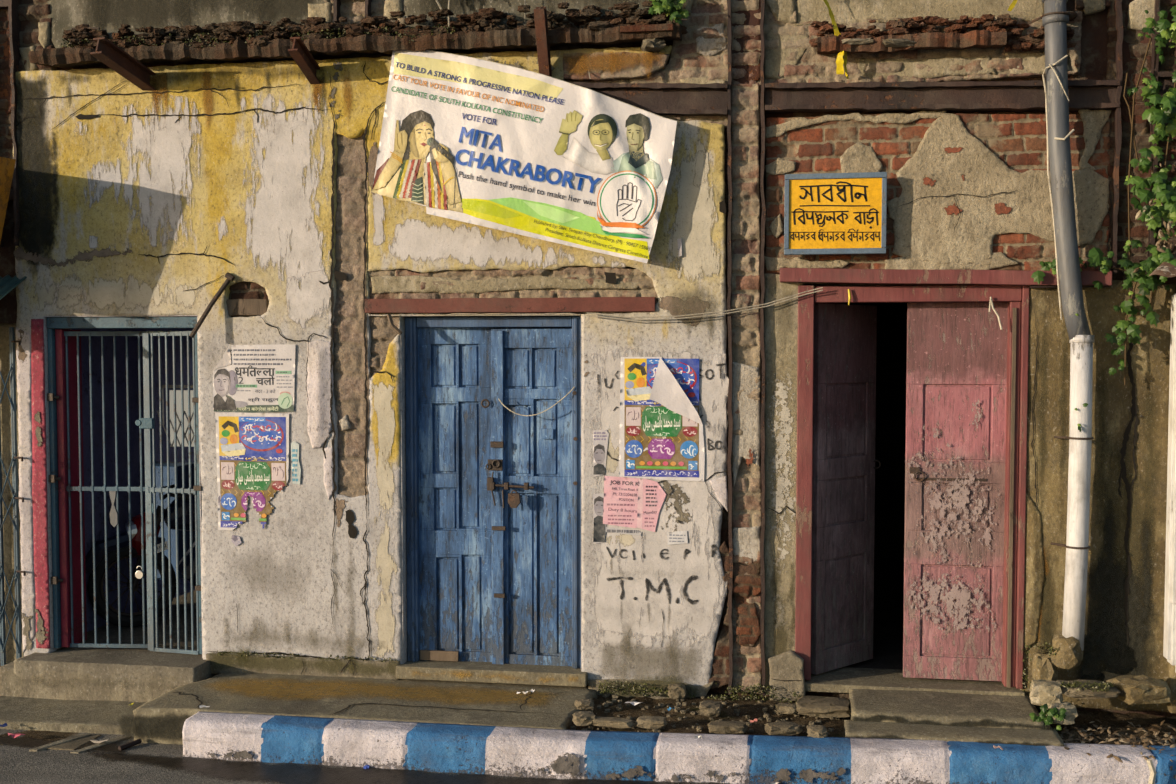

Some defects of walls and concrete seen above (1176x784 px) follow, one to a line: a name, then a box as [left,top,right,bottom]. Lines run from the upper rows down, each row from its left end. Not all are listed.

water stain [13,76,59,274]
peeling [13,96,201,311]
crack [16,61,394,675]
flaking render [229,281,269,301]
peeling [239,60,710,657]
peeling [584,83,937,694]
peeling [905,422,1001,634]
flaking render [950,113,1050,173]
flaking render [990,233,1056,271]
water stain [1076,386,1157,682]
crack [1118,288,1139,646]
crack [332,692,565,715]